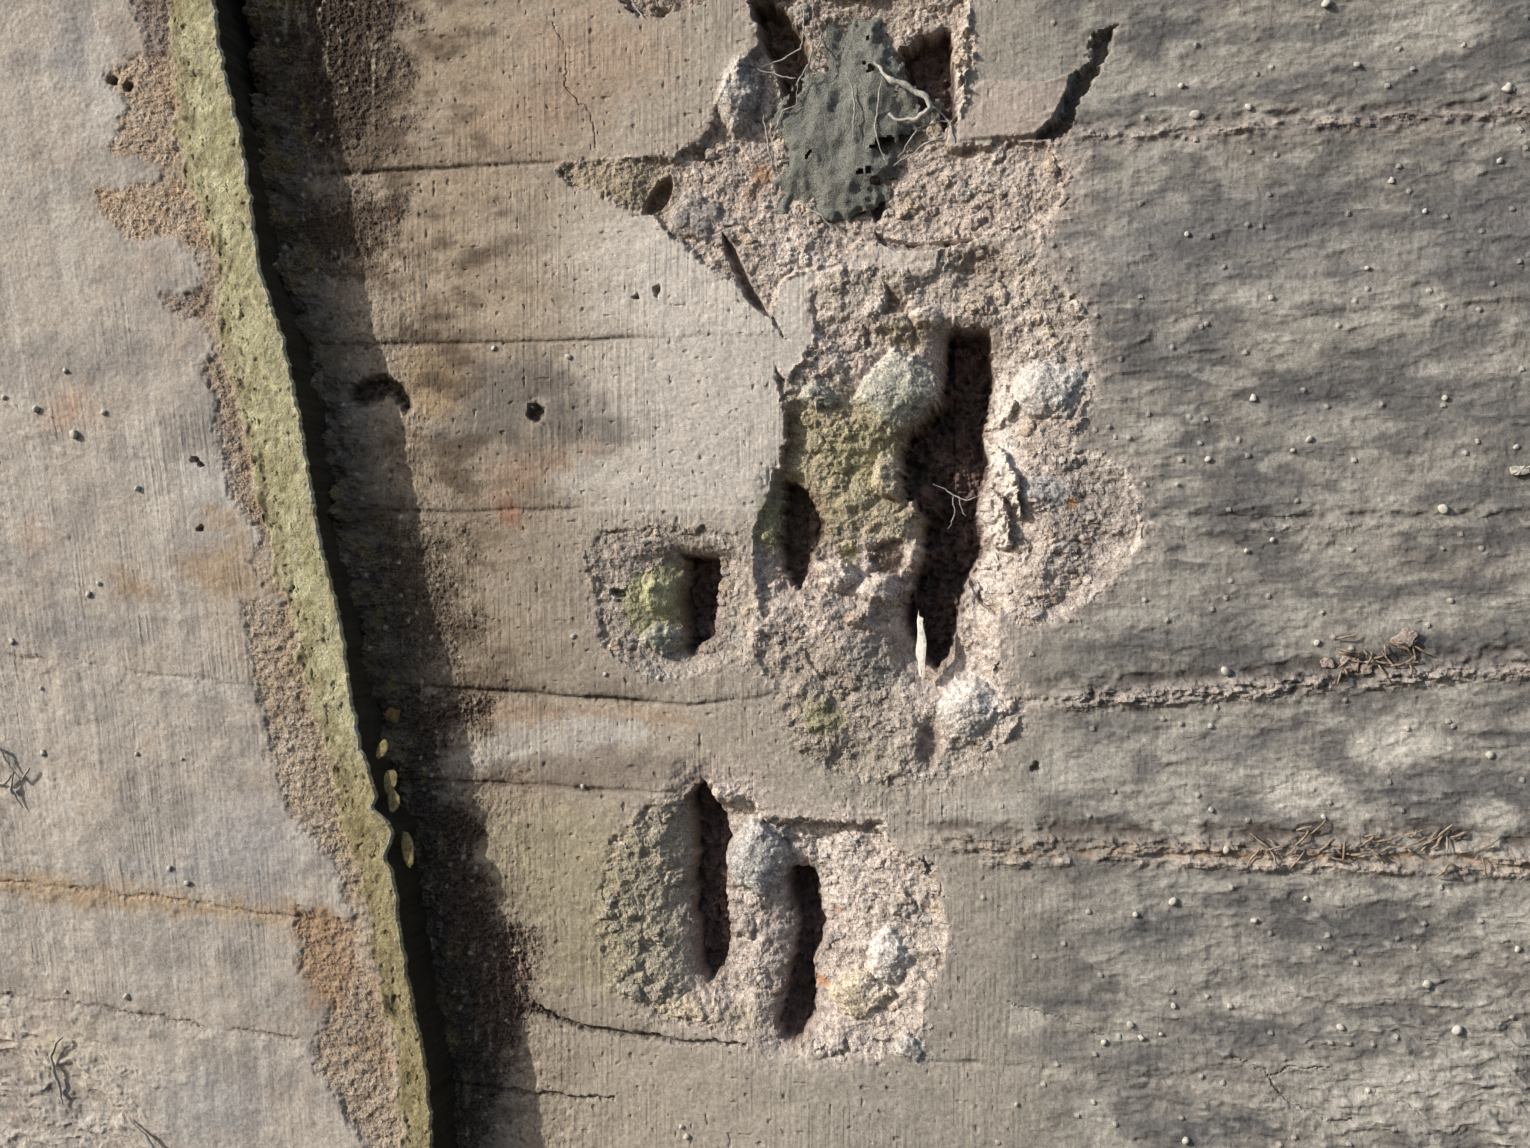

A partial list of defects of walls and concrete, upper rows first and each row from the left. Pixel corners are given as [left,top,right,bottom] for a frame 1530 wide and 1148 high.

damp [246,0,430,290]
damp [417,342,672,497]
spalling [555,0,1146,791]
damp [336,506,798,1148]
spalling [591,777,954,1068]